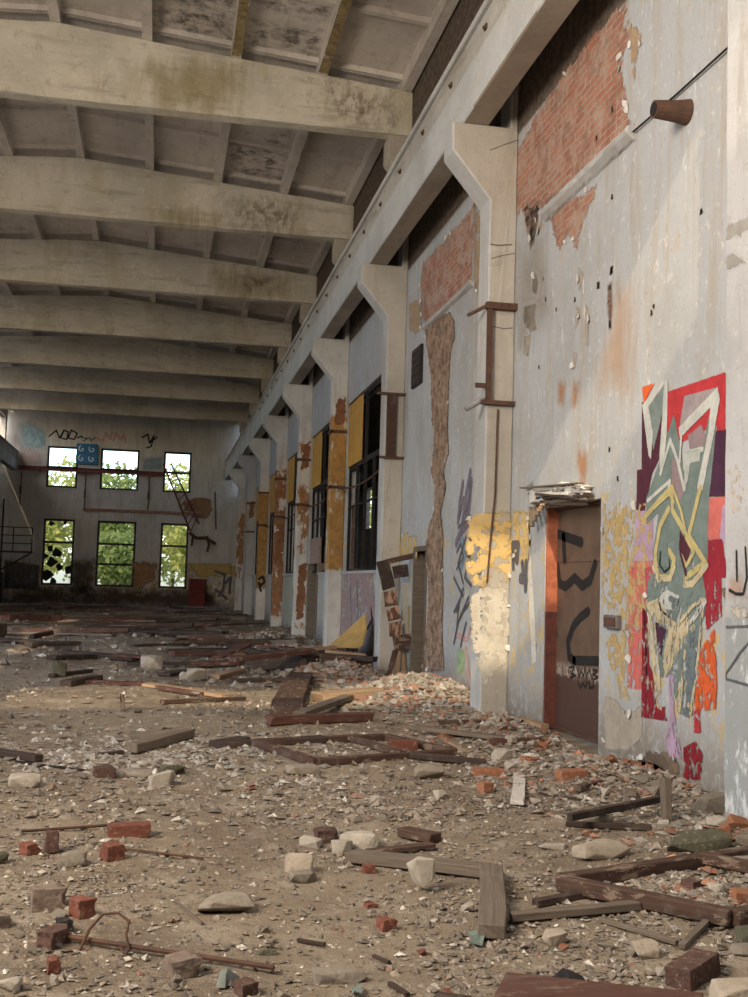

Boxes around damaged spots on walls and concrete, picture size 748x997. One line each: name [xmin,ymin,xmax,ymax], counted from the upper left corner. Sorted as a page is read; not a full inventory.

leakage [226,0,250,57]
leakage [319,0,353,74]
flaking render [517,4,641,251]
peeling [334,396,346,425]
spalling [400,203,480,672]
peeling [600,501,679,775]